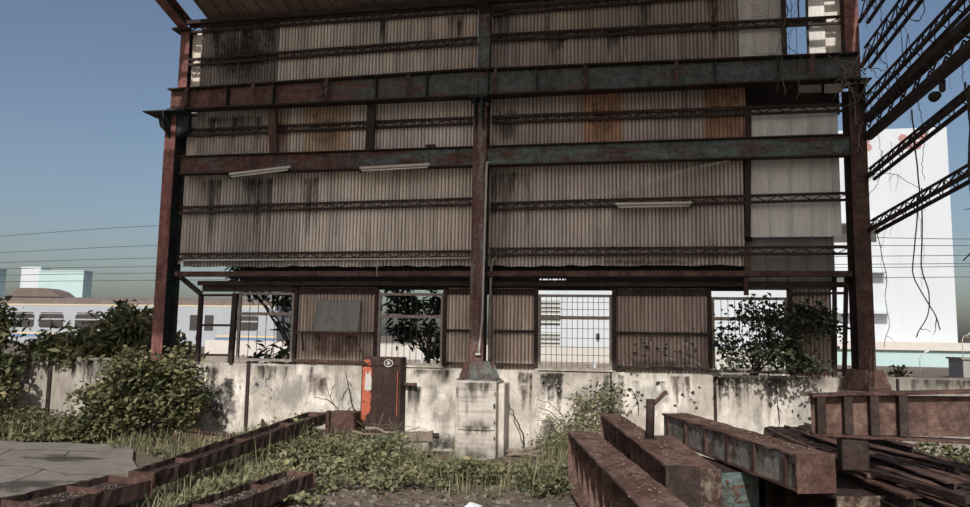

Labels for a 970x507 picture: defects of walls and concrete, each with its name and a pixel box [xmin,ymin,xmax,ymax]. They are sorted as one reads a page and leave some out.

leakage [207,367,235,426]
leakage [518,373,563,399]
leakage [718,377,786,425]